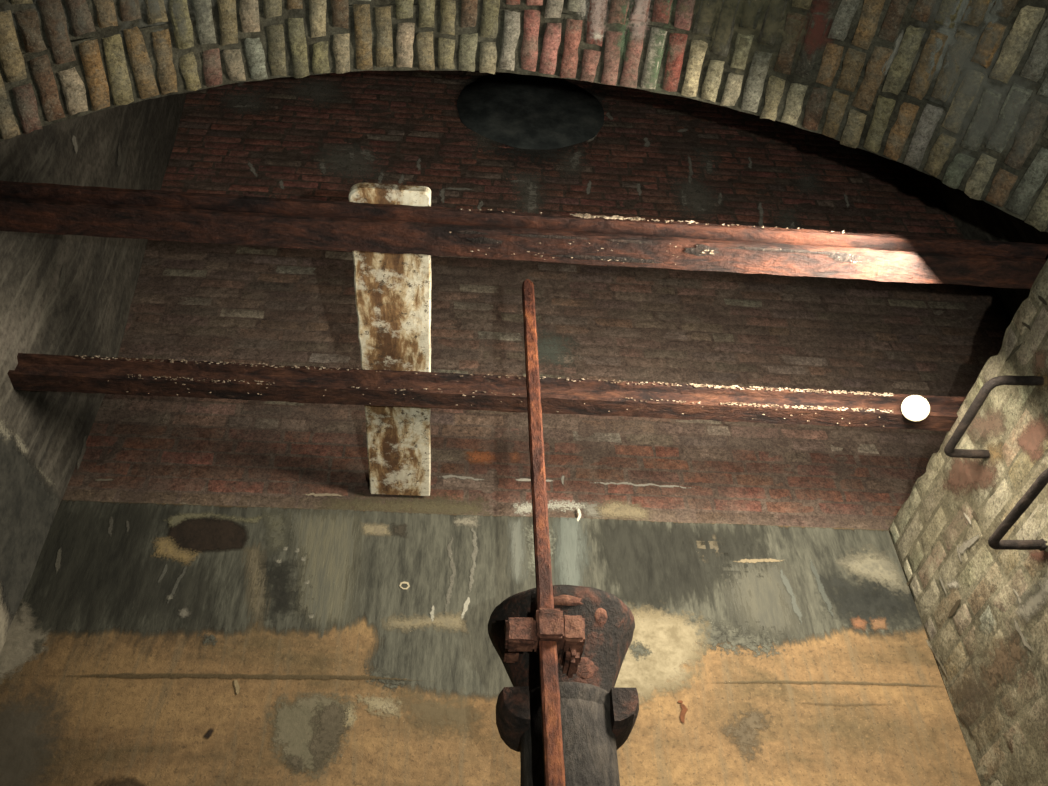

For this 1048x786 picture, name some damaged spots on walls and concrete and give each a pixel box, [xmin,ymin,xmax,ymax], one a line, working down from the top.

rust [570,213,707,225]
rust [75,355,386,372]
rust [603,379,893,427]
water stain [242,493,487,637]
water stain [507,502,535,583]
water stain [548,500,650,586]
water stain [696,535,719,561]
water stain [837,548,909,592]
rust [553,595,583,606]
rust [594,608,608,627]
water stain [721,556,810,643]
rust [576,657,599,679]